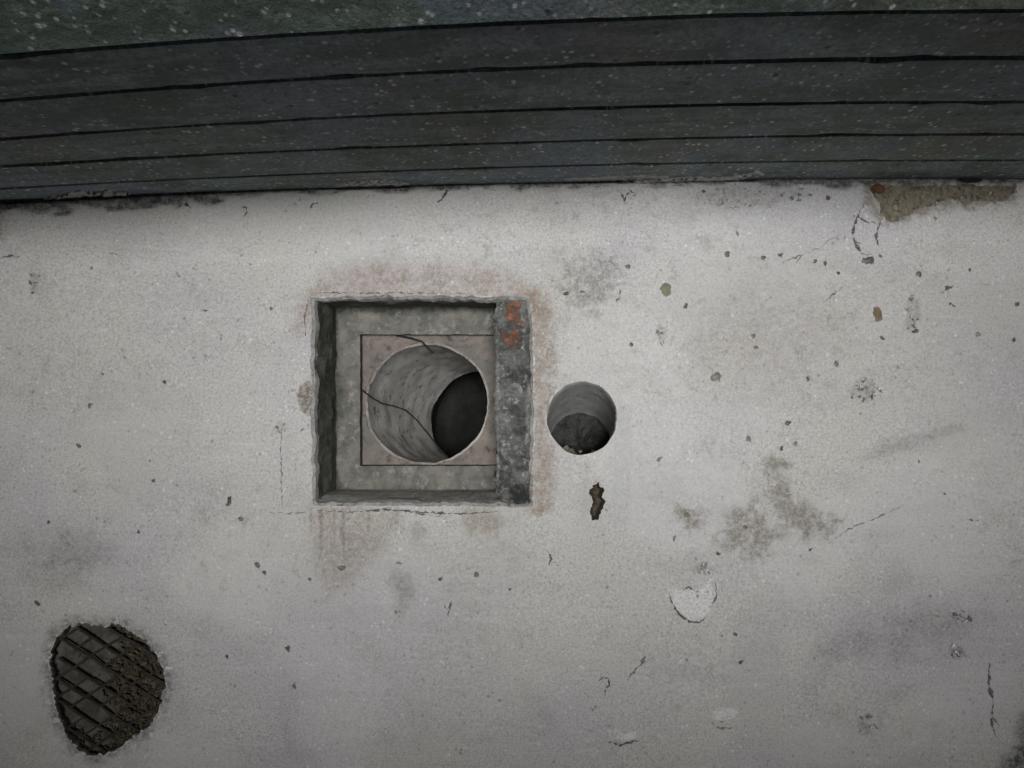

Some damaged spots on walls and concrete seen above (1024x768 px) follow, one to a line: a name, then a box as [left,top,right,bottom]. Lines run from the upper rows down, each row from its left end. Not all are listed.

spalling [865,178,1017,222]
crack [780,204,881,263]
spalling [589,482,606,520]
peeling [668,578,717,623]
spalling [40,615,174,757]